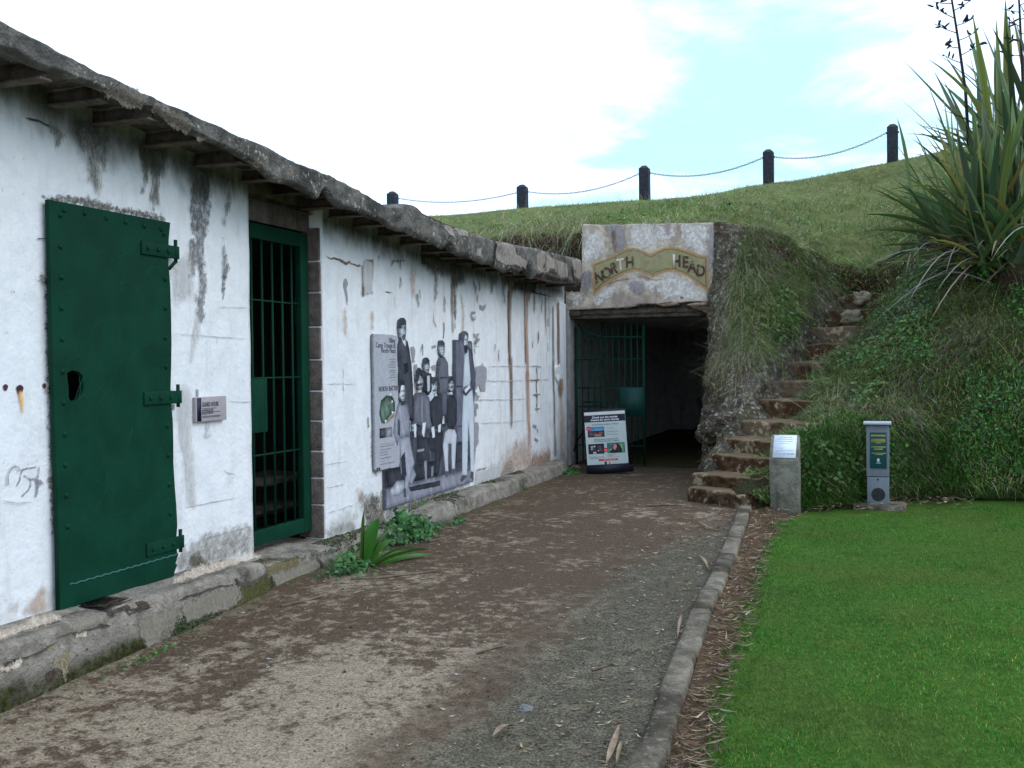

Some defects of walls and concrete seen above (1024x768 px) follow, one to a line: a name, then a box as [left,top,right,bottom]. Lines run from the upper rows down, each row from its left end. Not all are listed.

water stain [0,85,249,213]
crack [328,257,364,267]
rust [524,282,534,445]